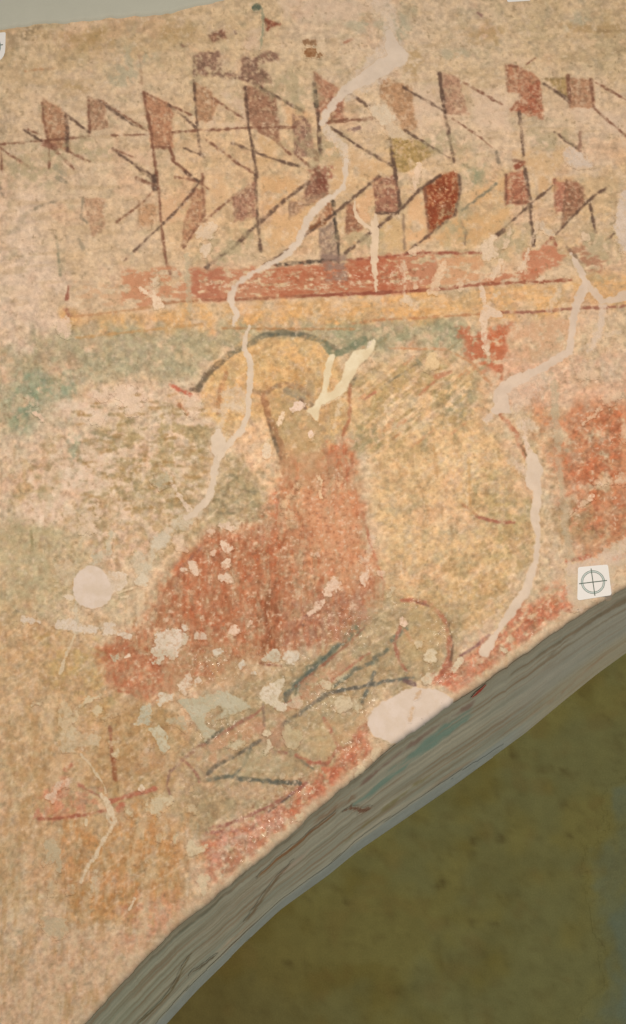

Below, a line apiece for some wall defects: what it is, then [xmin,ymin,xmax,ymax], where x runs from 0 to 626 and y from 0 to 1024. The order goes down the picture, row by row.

crack [411,161,423,191]
crack [135,0,414,589]
crack [477,251,626,659]
peeling [357,531,397,598]
peeling [306,575,343,620]
flaking render [150,621,225,666]
peeling [227,619,254,637]
flaking render [132,648,304,756]
flaking render [318,671,365,714]